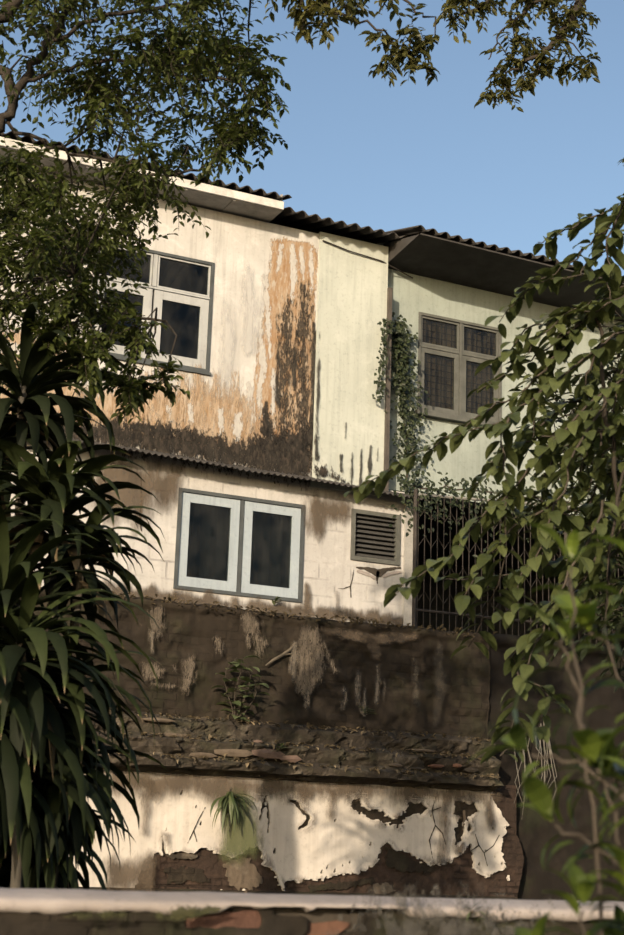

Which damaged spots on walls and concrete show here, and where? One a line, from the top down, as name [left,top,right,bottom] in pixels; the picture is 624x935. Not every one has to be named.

damp [63,281,378,538]
damp [341,665,386,716]
spalling [135,798,524,897]
crack [429,797,445,858]
crack [471,834,499,866]